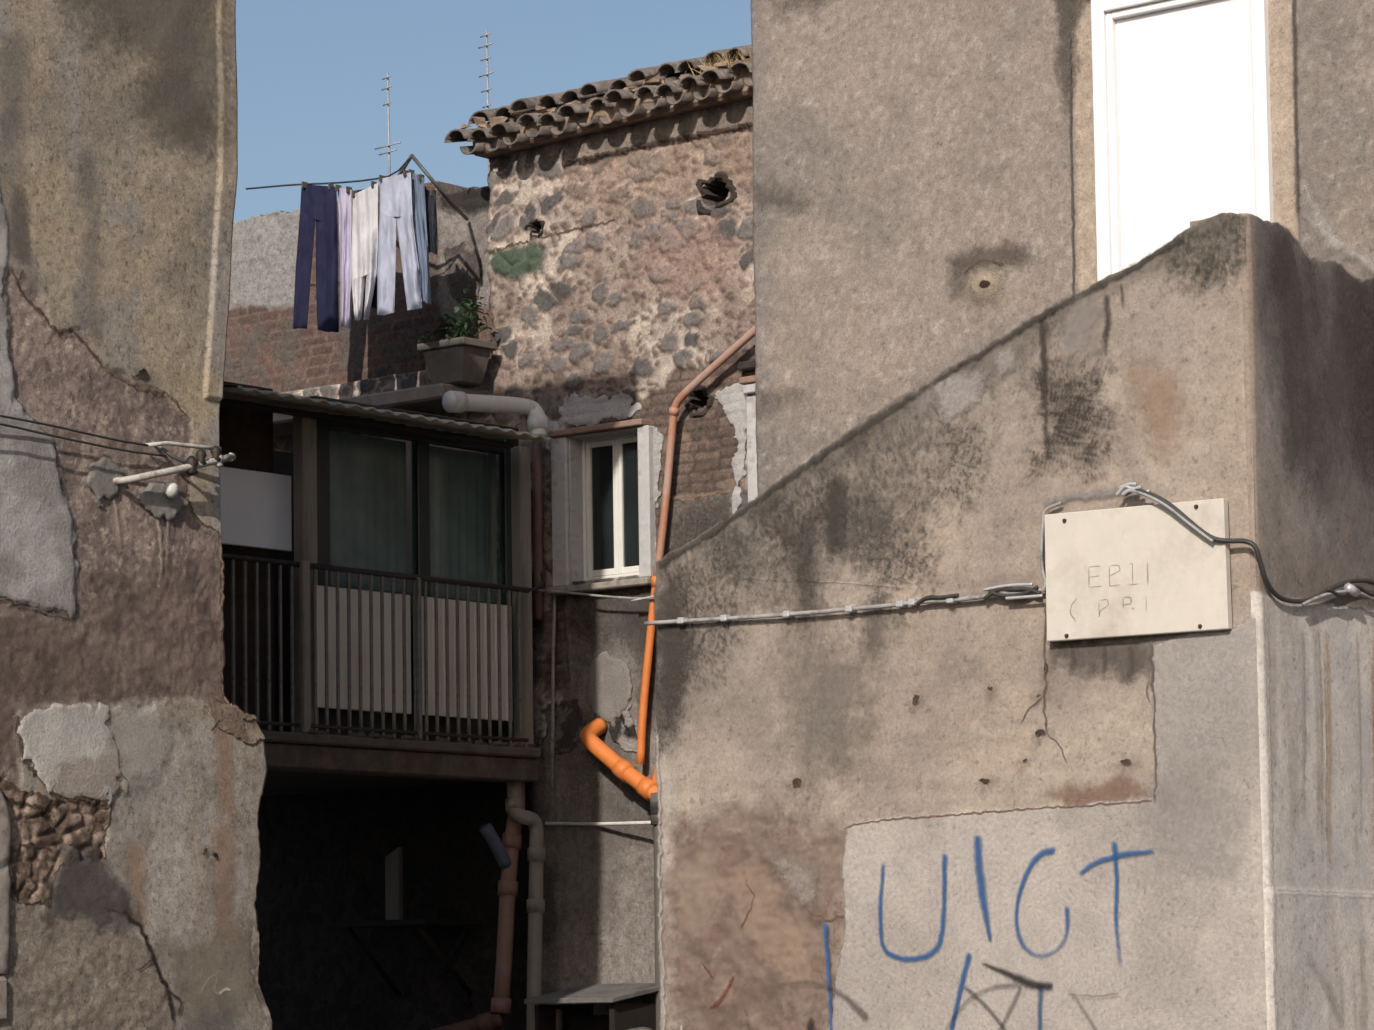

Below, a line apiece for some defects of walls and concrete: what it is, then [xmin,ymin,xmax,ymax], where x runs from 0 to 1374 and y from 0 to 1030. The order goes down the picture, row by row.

flaking render [0,193,80,619]
flaking render [545,390,642,453]
flaking render [685,383,748,518]
water stain [1035,307,1111,466]
water stain [1103,285,1123,346]
flaking render [0,700,171,908]
spalling [208,539,265,745]
water stain [654,407,981,750]
crack [845,645,1158,829]
crack [1022,602,1067,762]
water stain [1050,632,1195,681]
crack [108,908,182,1021]